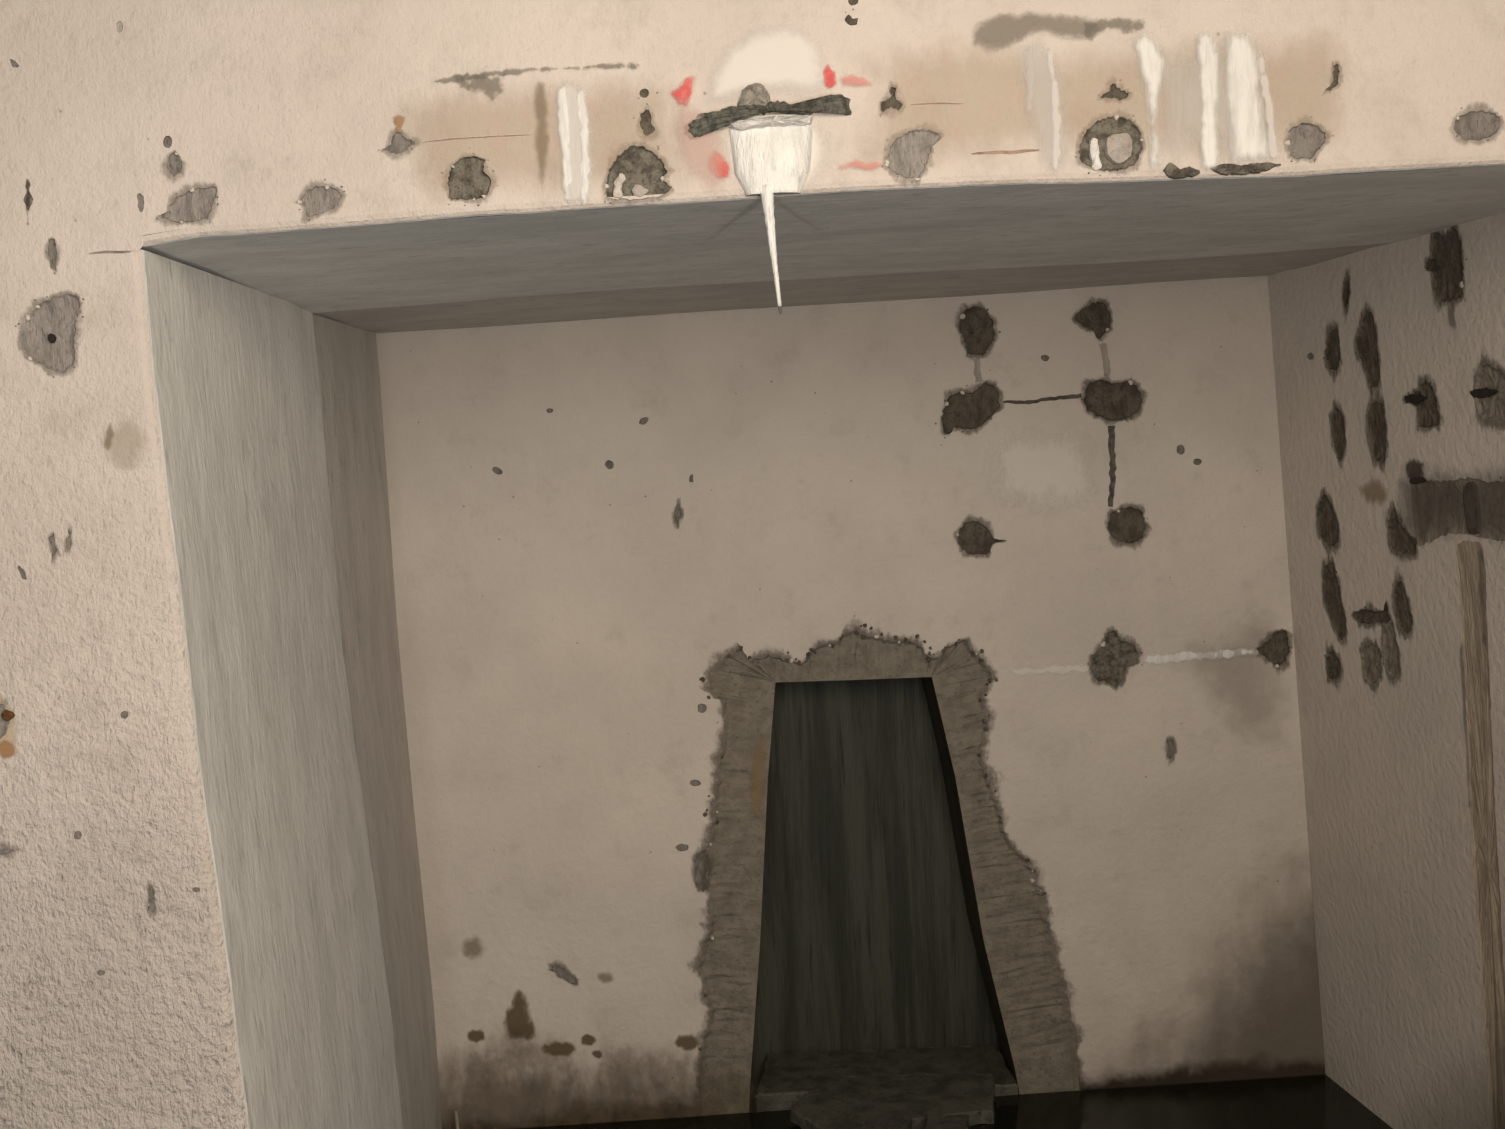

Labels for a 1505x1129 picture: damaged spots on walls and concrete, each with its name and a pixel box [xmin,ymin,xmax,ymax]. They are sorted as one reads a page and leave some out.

spalling [15,293,84,378]
corrosion [0,720,14,758]
spalling [675,623,1082,1114]
damp [468,1030,484,1042]
damp [506,991,601,1058]
damp [676,1036,697,1050]
damp [440,1065,721,1129]